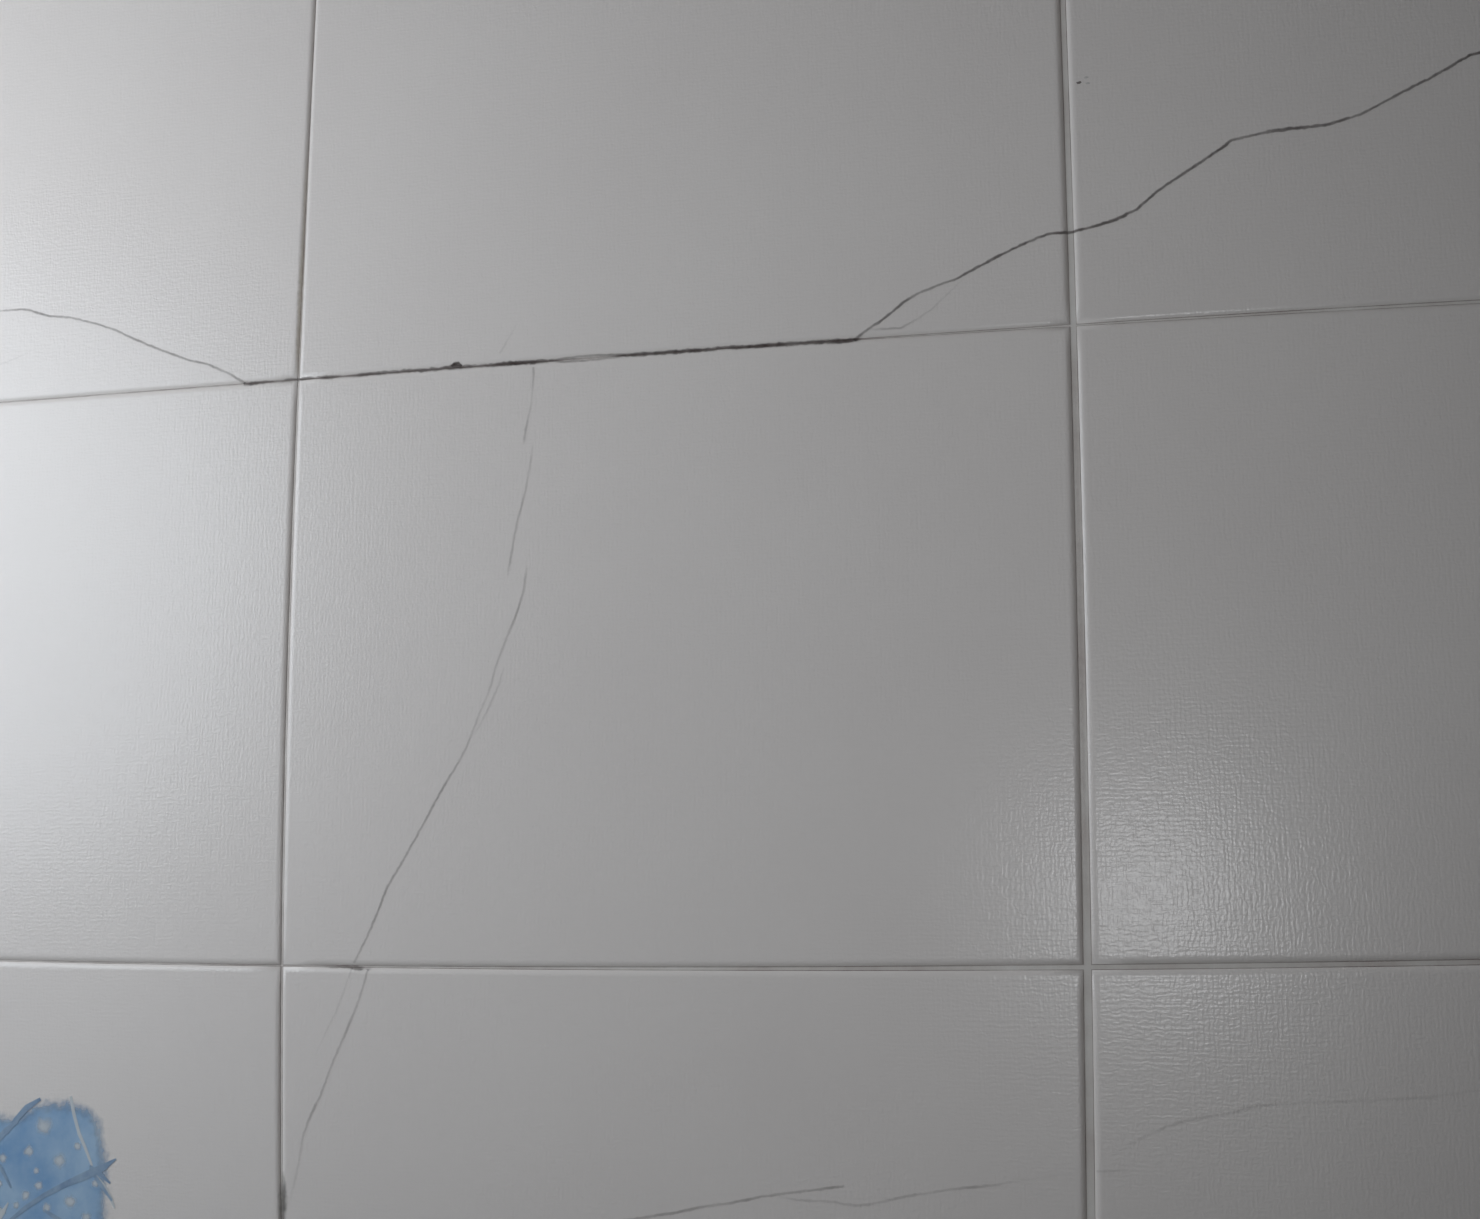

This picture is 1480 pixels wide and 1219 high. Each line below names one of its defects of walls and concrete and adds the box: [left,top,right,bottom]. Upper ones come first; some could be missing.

crack [985,194,1154,264]
crack [628,338,856,356]
crack [324,360,546,379]